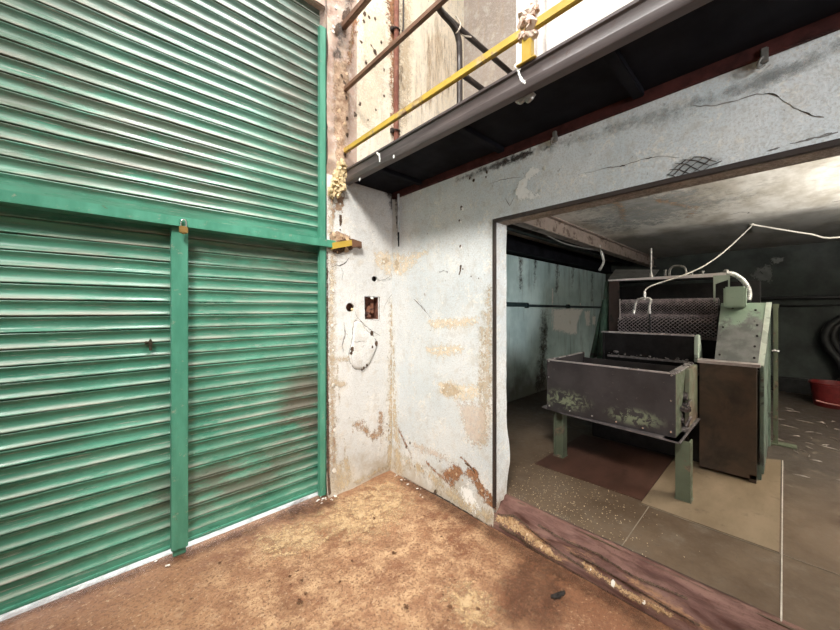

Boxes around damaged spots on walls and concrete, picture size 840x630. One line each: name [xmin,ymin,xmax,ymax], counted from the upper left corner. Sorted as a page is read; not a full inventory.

peeling [327,0,391,495]
peeling [515,166,546,201]
crack [582,156,678,174]
crack [692,93,838,151]
water stain [336,289,650,627]
spalling [426,457,700,626]